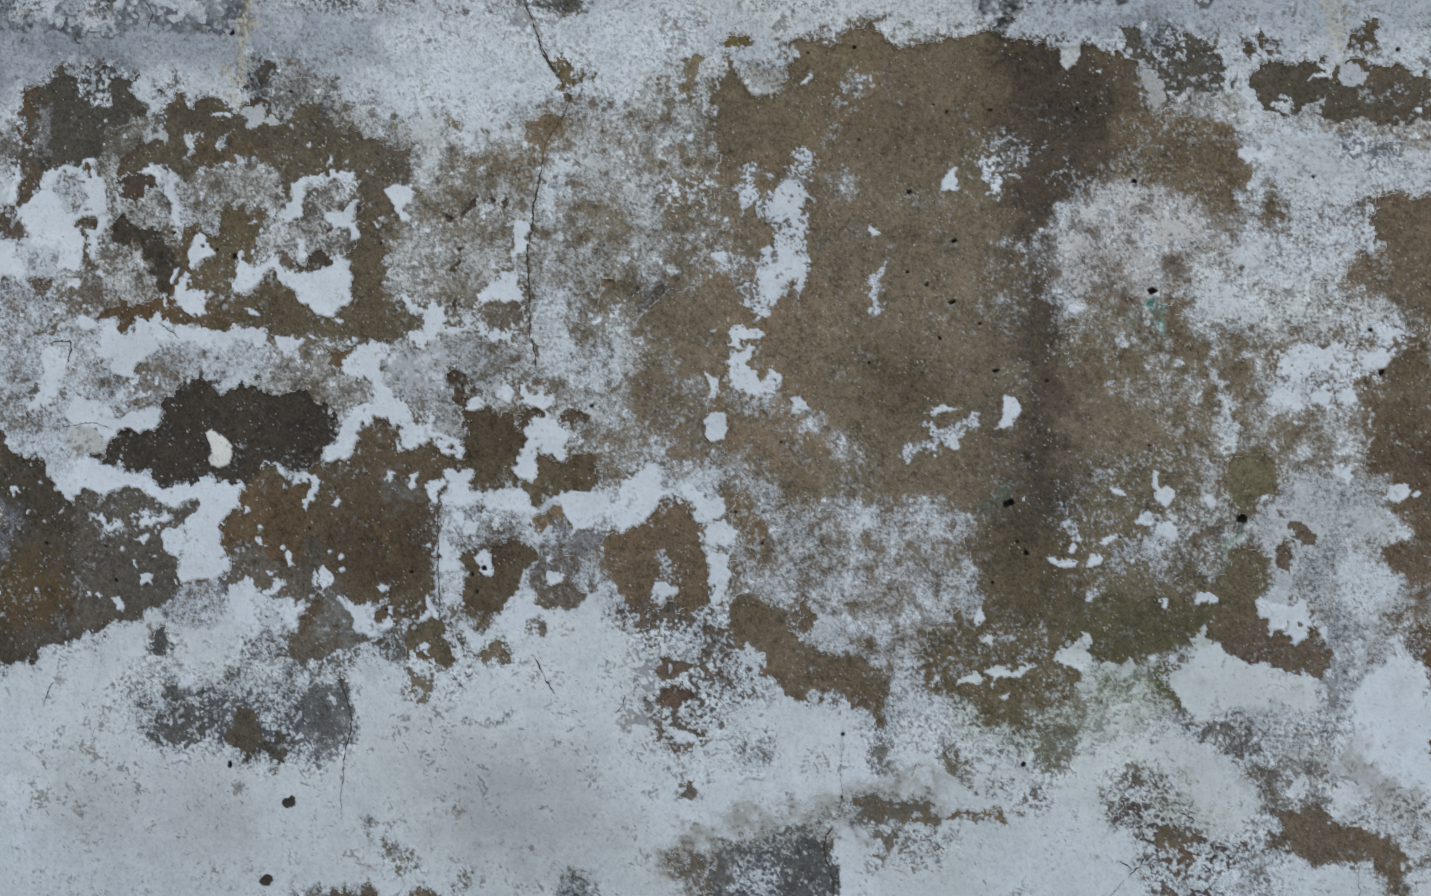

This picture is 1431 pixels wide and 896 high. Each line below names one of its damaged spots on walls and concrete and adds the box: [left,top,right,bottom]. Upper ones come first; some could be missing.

spalling [0,431,200,666]
spalling [89,364,600,766]
spalling [0,55,725,489]
crack [524,1,571,368]
spalling [595,15,1431,776]
peeling [666,742,1049,896]
spalling [1108,757,1431,896]